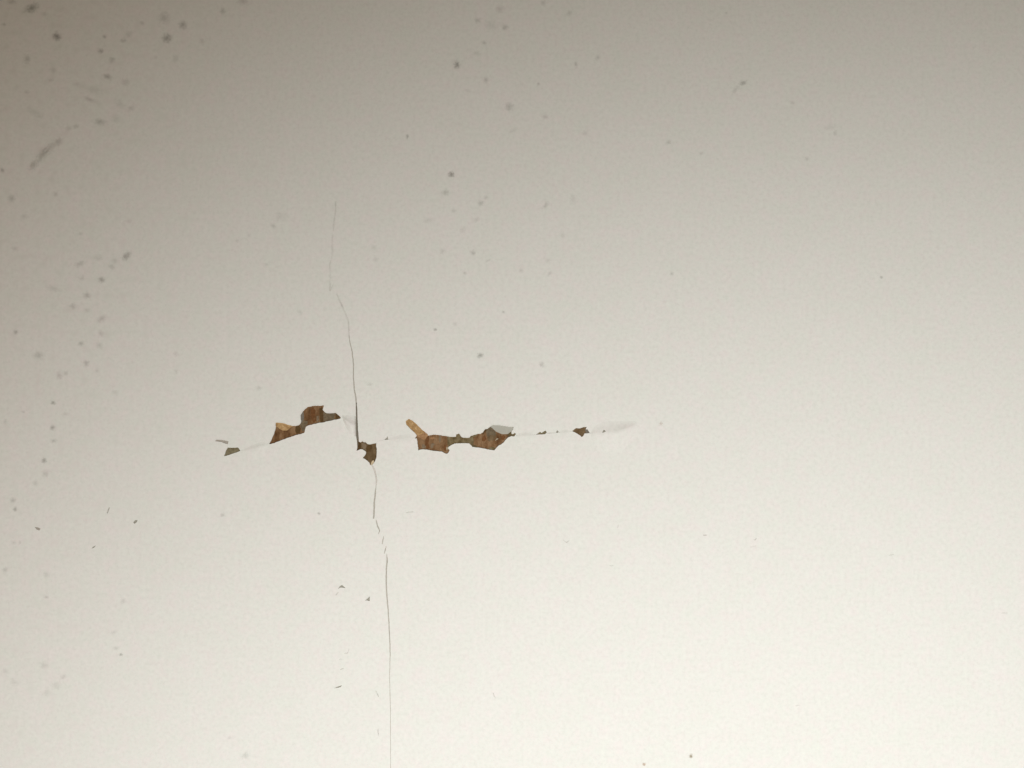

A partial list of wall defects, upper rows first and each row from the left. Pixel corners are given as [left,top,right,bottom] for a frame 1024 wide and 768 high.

peeling [572,426,606,437]
peeling [215,439,241,457]
crack [349,337,391,768]